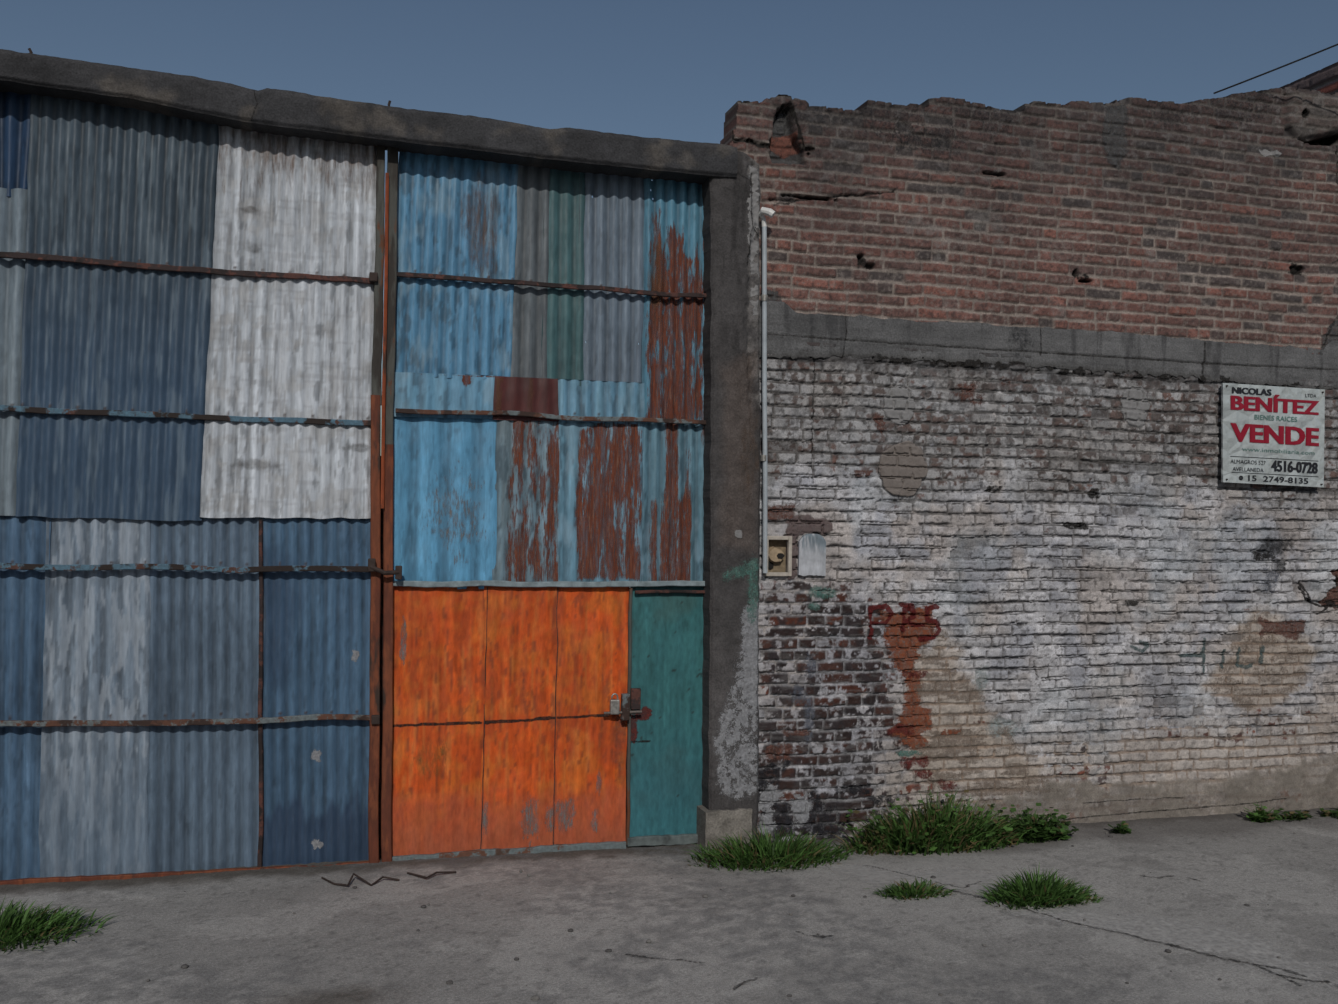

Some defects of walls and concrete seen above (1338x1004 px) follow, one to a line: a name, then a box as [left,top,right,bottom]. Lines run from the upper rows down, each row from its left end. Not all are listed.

crack [768,316,1338,483]
spalling [1318,569,1338,609]
peeling [709,598,811,801]
flaking render [1208,613,1315,711]
peeling [835,783,895,805]